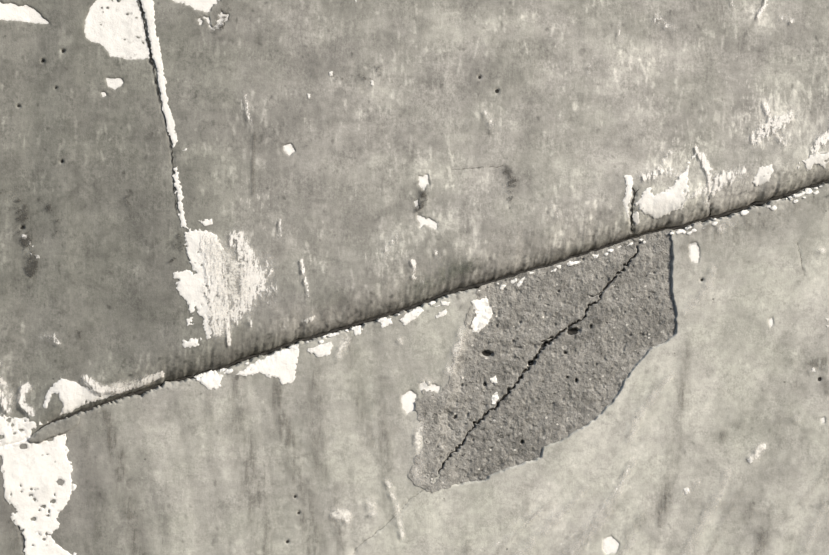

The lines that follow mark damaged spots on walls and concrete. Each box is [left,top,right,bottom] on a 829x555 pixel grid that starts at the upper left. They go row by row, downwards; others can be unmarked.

peeling [0,2,49,24]
peeling [84,0,187,151]
crack [138,0,177,210]
peeling [172,166,224,348]
peeling [622,153,697,226]
damp [639,150,681,181]
damp [686,146,748,207]
damp [751,102,794,146]
damp [811,129,829,154]
crack [438,187,639,474]
spalling [401,229,676,493]
flaking render [0,413,77,555]